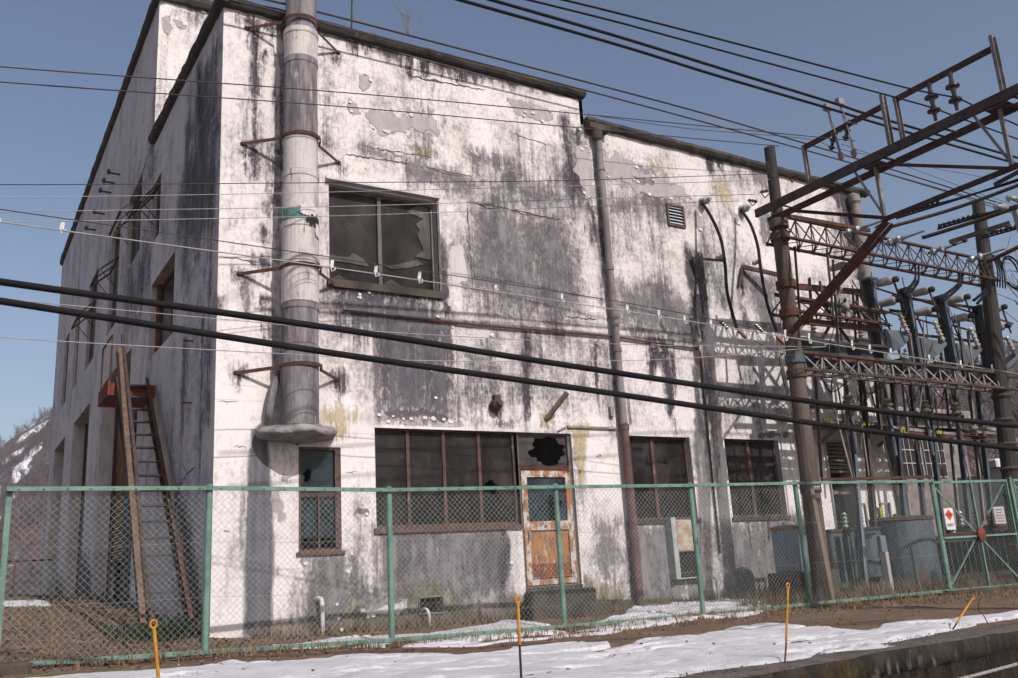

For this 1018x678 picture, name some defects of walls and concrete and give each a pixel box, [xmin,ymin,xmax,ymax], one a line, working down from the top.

leakage [231,15,285,339]
peeling [359,72,373,91]
peeling [347,98,446,139]
peeling [507,97,553,122]
leakage [557,115,582,219]
peeling [573,124,597,199]
peeling [603,149,693,202]
leakage [175,40,222,468]
leakage [329,239,461,425]
leakage [519,333,531,421]
leakage [588,204,721,497]
leakage [244,424,275,637]